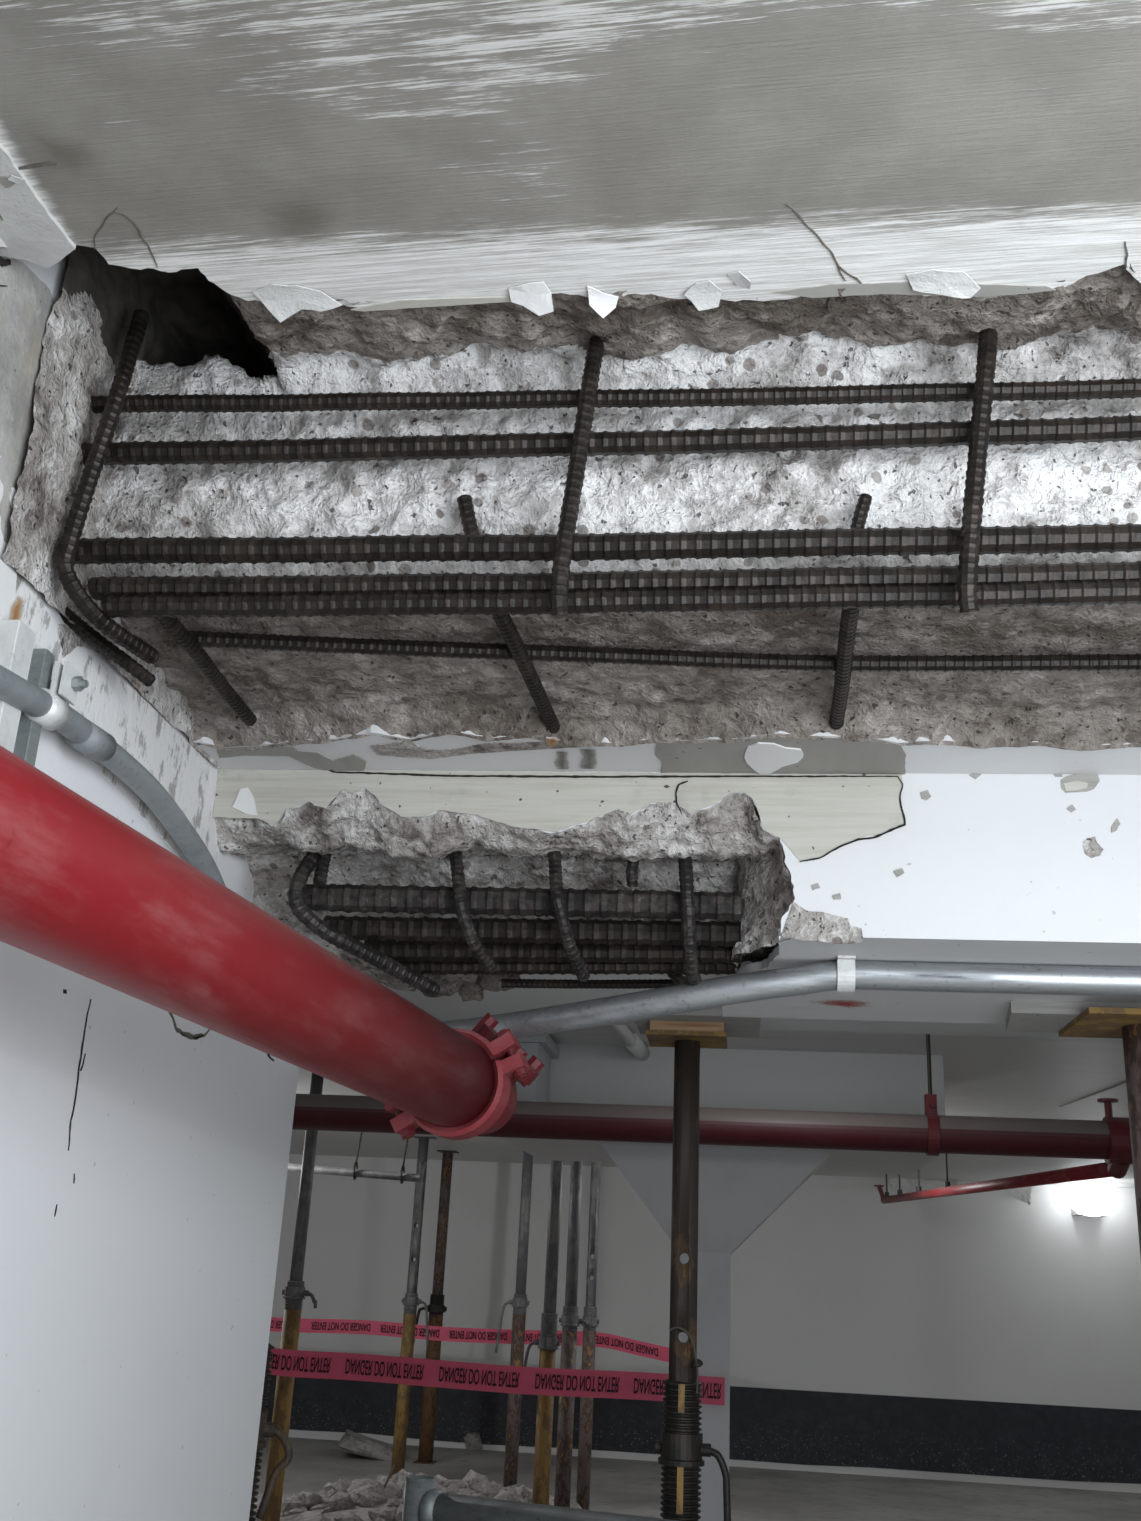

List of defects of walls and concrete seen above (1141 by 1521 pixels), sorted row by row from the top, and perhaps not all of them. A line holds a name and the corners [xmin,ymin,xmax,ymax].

crack [18,161,57,170]
spalling [0,143,1141,1002]
crack [54,999,91,1217]
crack [169,1012,210,1040]